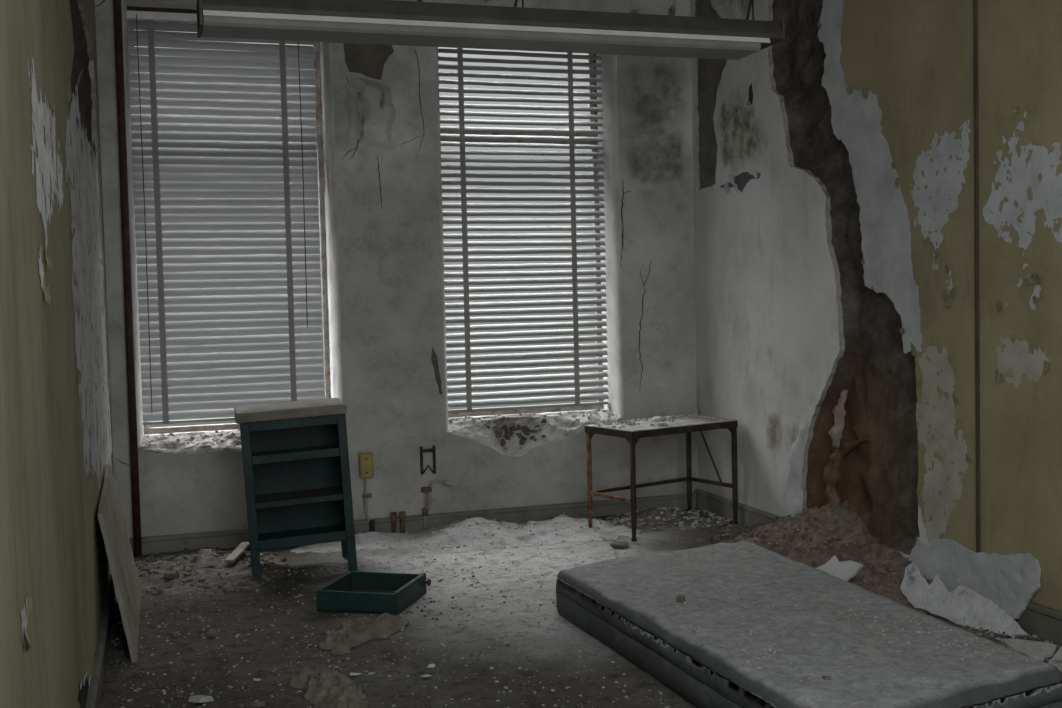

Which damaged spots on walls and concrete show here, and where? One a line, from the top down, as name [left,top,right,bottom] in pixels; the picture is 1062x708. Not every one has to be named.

peeling [27,0,112,492]
flaking render [343,43,394,80]
crack [341,50,424,208]
crack [621,183,652,392]
flaking render [693,0,720,18]
flaking render [695,58,761,193]
flaking render [768,0,972,556]
peeling [983,104,1062,310]
spalling [138,429,242,455]
spalling [446,409,623,457]